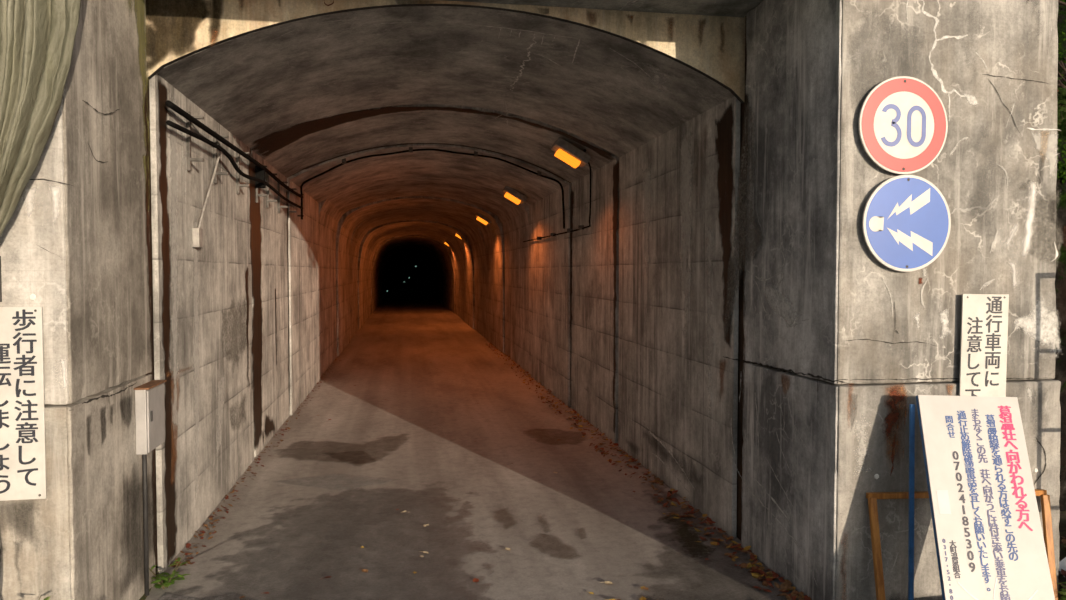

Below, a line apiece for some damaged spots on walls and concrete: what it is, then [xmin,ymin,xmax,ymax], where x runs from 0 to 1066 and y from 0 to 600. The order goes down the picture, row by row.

damp [145,0,222,69]
crack [906,0,1049,155]
crack [950,163,1008,253]
damp [124,82,187,582]
damp [941,311,951,334]
damp [1016,301,1060,351]
damp [87,399,132,452]
damp [216,378,224,459]
rust [885,386,907,473]